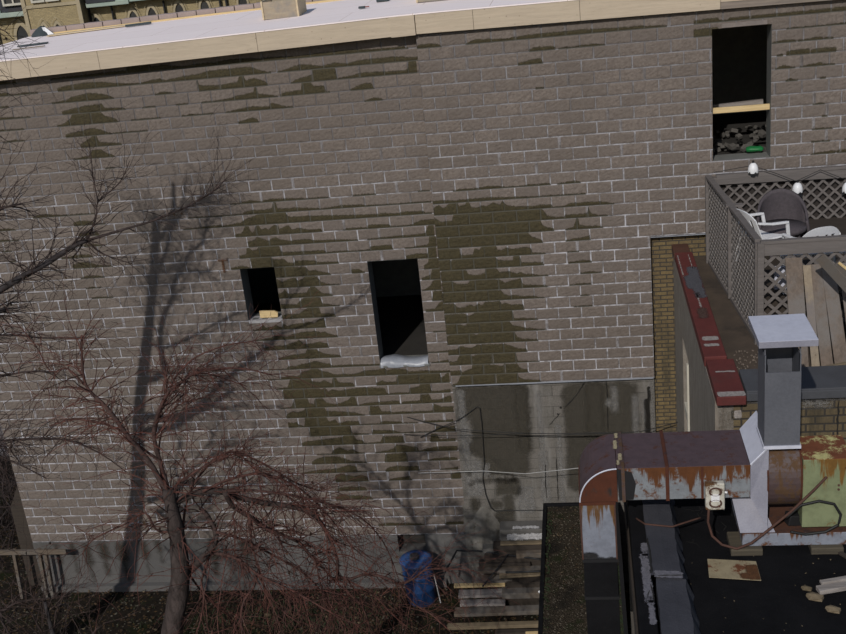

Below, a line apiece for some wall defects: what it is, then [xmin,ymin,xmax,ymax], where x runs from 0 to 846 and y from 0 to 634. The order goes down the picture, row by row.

leakage [50,43,442,169]
leakage [466,25,667,66]
leakage [184,180,614,523]
leakage [556,381,639,502]